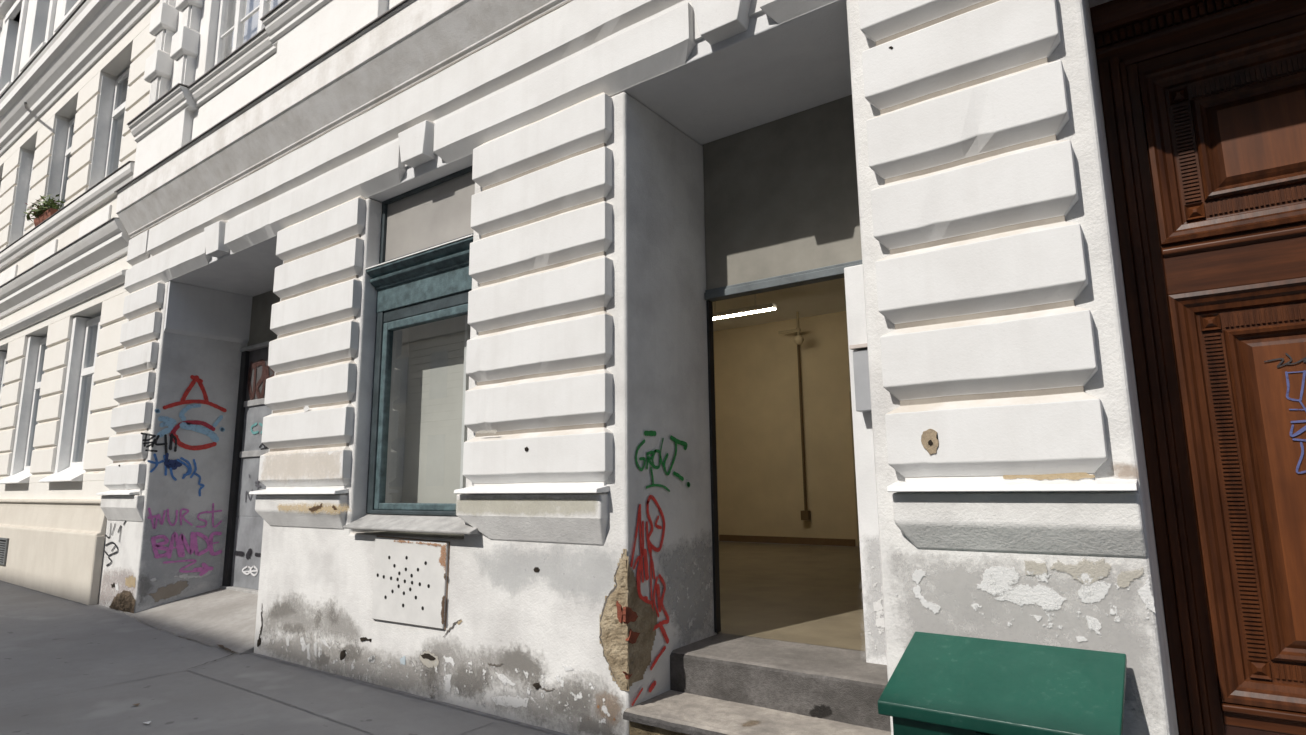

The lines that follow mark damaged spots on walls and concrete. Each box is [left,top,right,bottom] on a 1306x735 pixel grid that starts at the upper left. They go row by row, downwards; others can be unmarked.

spalling [921,429,939,455]
spalling [109,570,212,613]
spalling [599,549,713,691]
peeling [912,569,940,614]
peeling [971,559,1155,642]
damp [423,643,622,735]